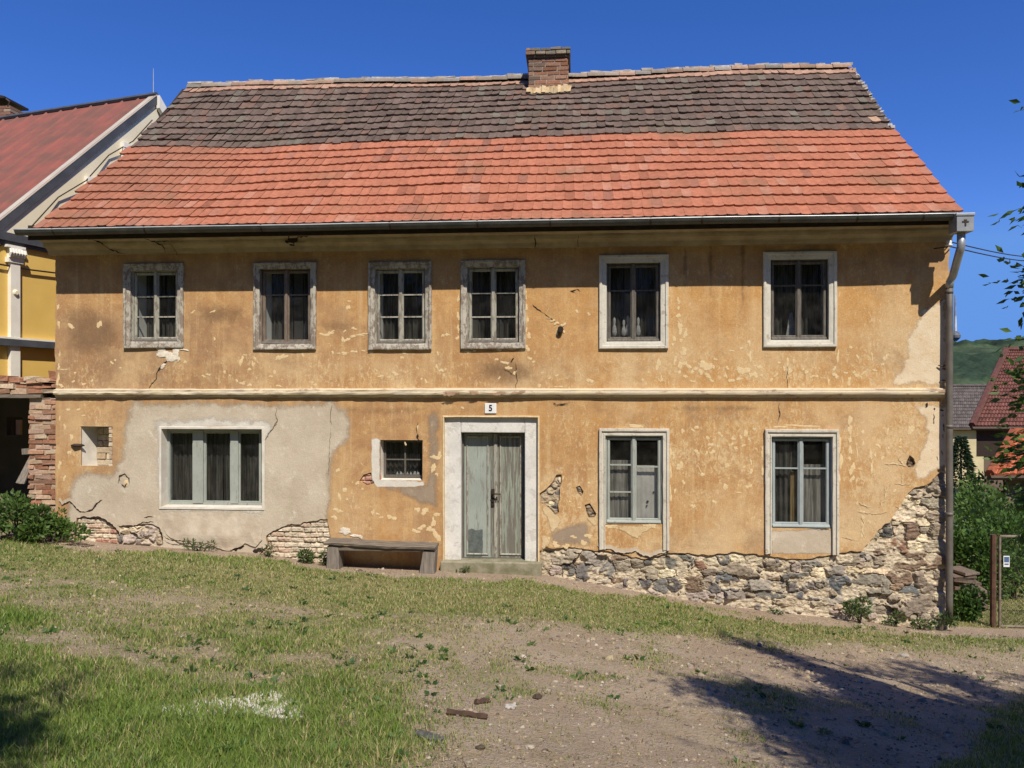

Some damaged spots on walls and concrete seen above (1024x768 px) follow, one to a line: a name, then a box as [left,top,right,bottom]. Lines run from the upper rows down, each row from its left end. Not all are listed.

flaking render [156,348,189,369]
peeling [892,299,946,392]
flaking render [76,517,163,547]
crack [59,497,222,548]
flaking render [262,470,381,564]
flaking render [540,474,656,551]